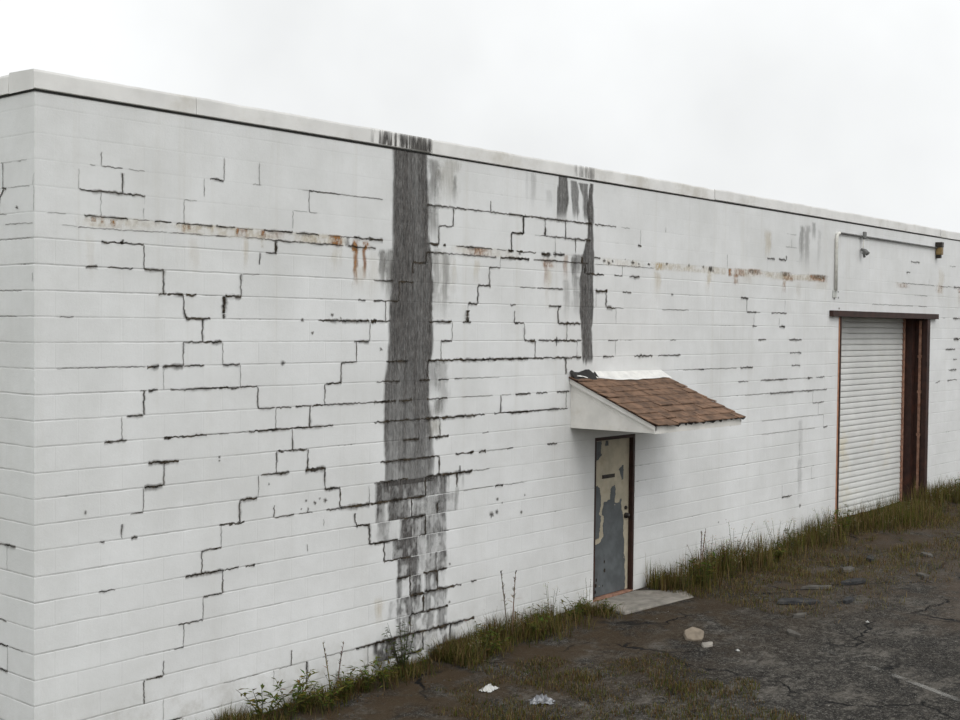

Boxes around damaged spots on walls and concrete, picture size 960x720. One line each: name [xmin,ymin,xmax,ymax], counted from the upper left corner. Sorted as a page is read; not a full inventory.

crack [80,153,144,197]
corrosion [331,236,368,272]
leakage [557,176,594,363]
crack [63,190,678,703]
leakage [374,131,447,667]
crack [699,297,824,403]
peeling [595,465,625,597]